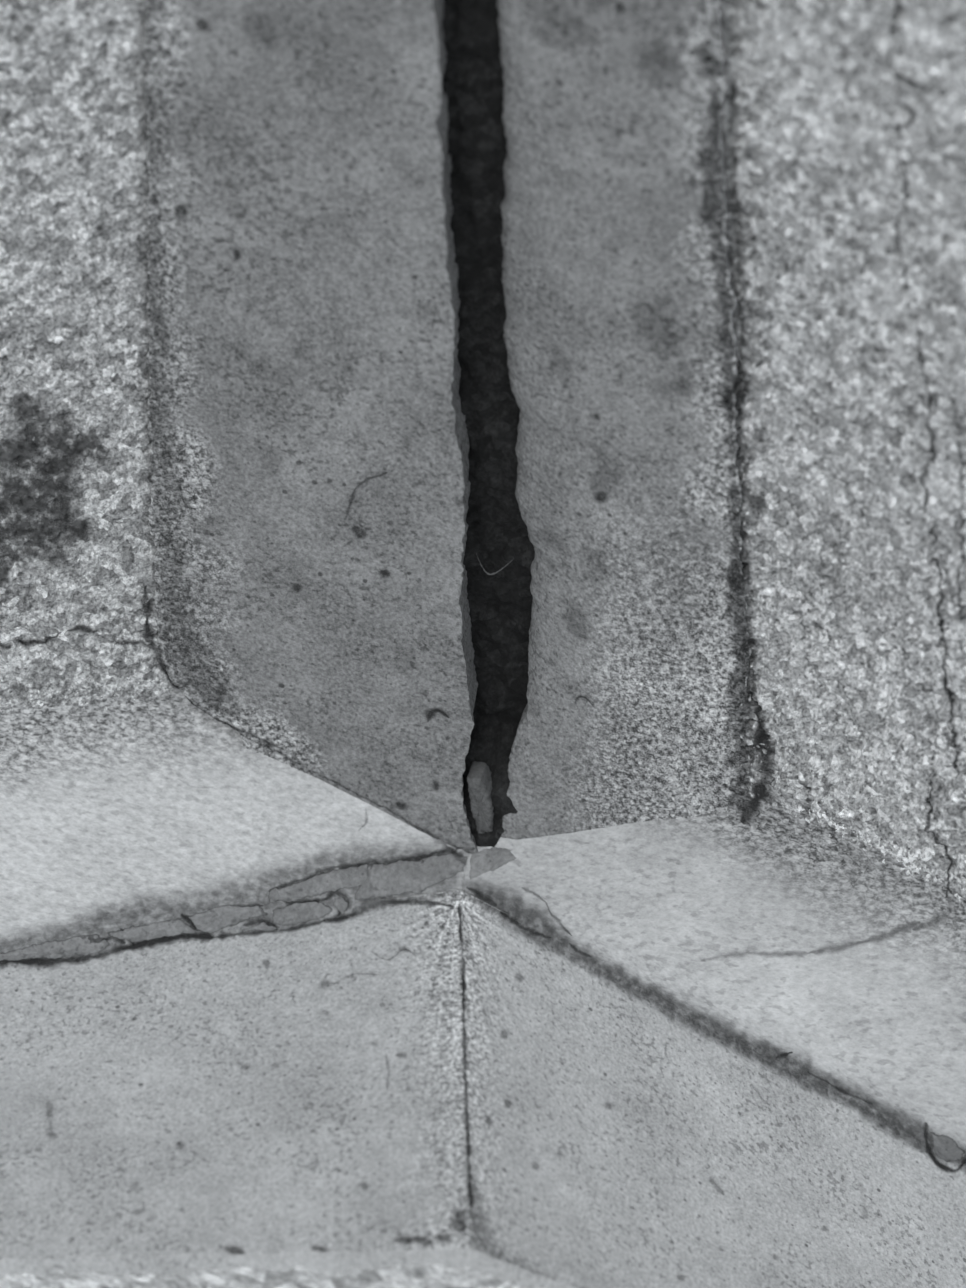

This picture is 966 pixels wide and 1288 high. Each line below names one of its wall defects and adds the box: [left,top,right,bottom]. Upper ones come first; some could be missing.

damp [0,395,100,584]
crack [810,0,966,953]
crack [0,779,591,1207]